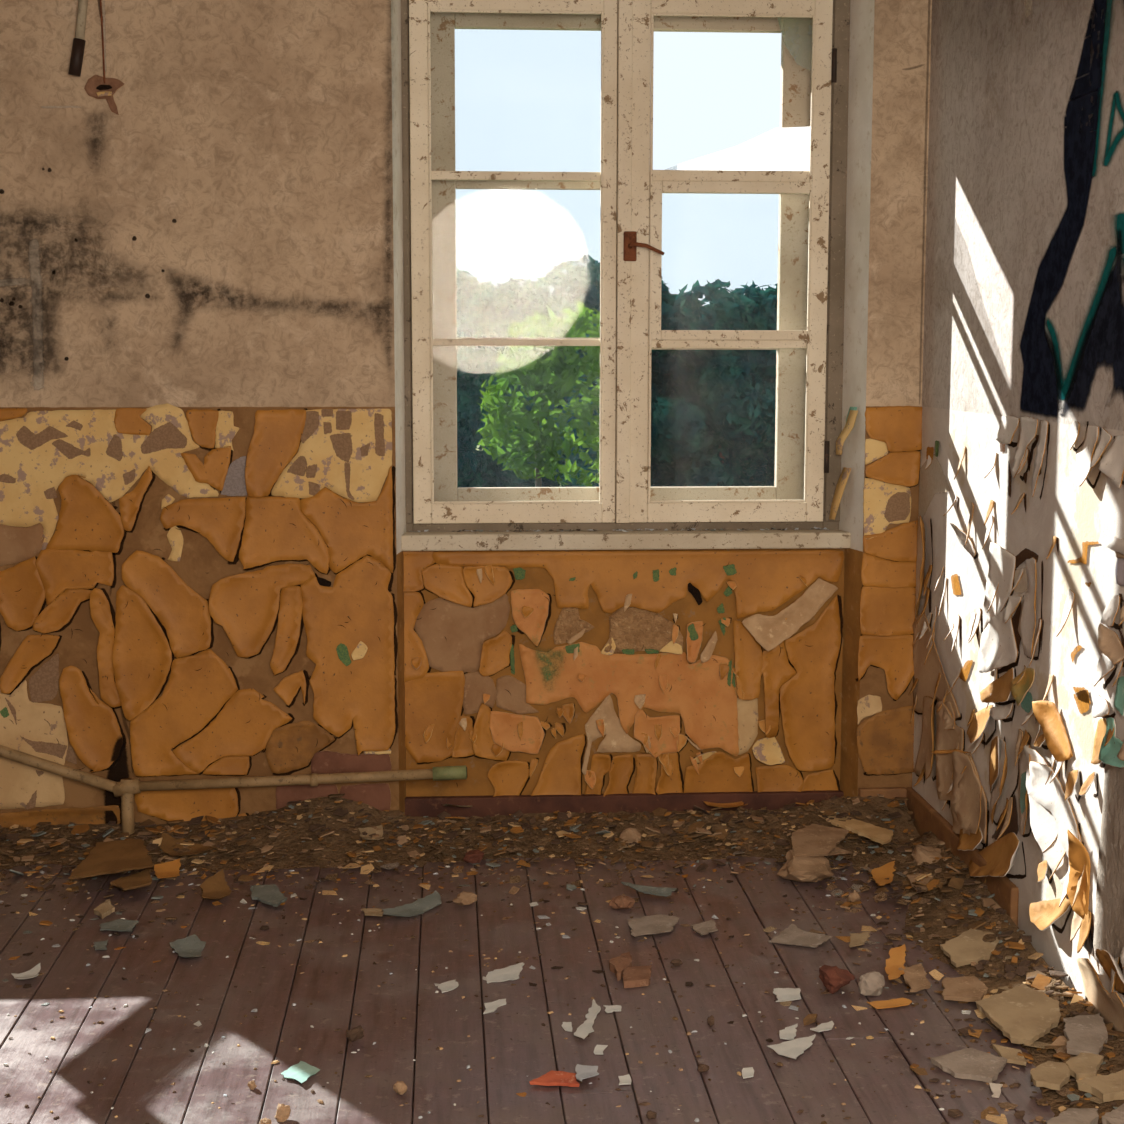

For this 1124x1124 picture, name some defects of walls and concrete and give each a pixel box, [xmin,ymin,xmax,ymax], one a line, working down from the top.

water stain [0,219,126,390]
water stain [161,269,282,316]
peeling [0,403,844,828]
peeling [829,406,1124,1032]
peeling [773,988,801,1002]
peeling [779,1021,834,1040]